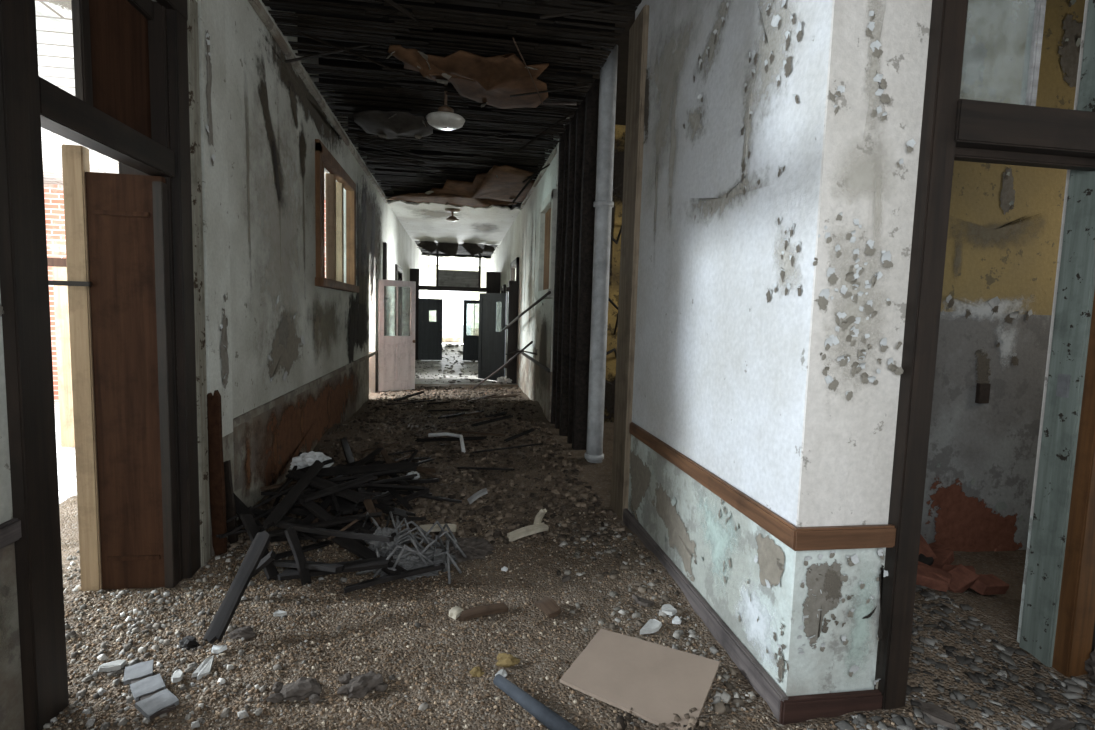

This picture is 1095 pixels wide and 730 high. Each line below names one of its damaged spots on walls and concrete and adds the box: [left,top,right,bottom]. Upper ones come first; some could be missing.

leakage [245,33,341,325]
leakage [313,181,382,368]
peeling [387,165,535,208]
peeling [386,45,549,109]
peeling [693,0,802,221]
peeling [766,216,801,303]
peeling [813,212,903,401]
flaking render [925,463,1024,552]
flaking render [738,533,888,683]